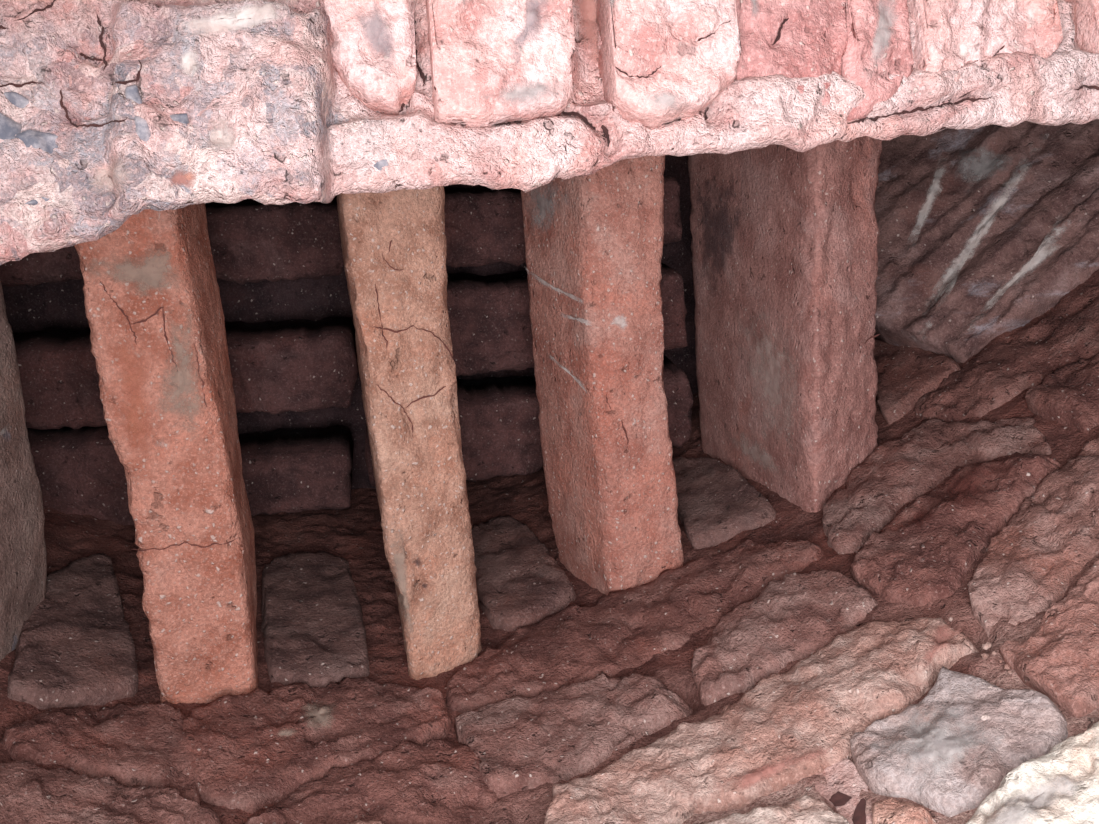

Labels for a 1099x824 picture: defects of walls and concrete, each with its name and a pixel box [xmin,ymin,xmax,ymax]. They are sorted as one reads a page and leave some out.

crack [0,0,56,29]
crack [79,14,142,85]
crack [0,81,127,128]
crack [848,97,991,124]
crack [374,240,453,358]
crack [375,384,446,436]